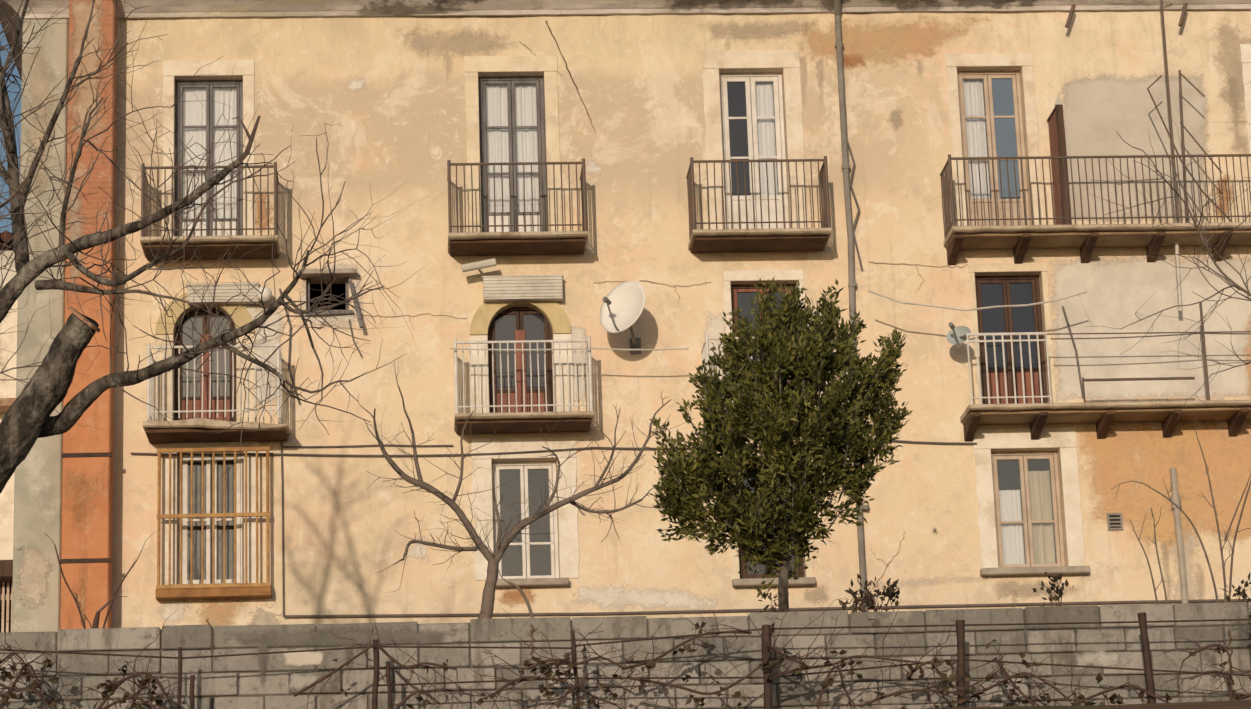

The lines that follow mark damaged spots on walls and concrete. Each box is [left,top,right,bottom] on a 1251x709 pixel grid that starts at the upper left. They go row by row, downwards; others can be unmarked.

leakage [357,0,482,14]
leakage [667,0,850,10]
leakage [411,30,503,54]
leakage [711,0,1035,66]
crack [519,21,596,132]